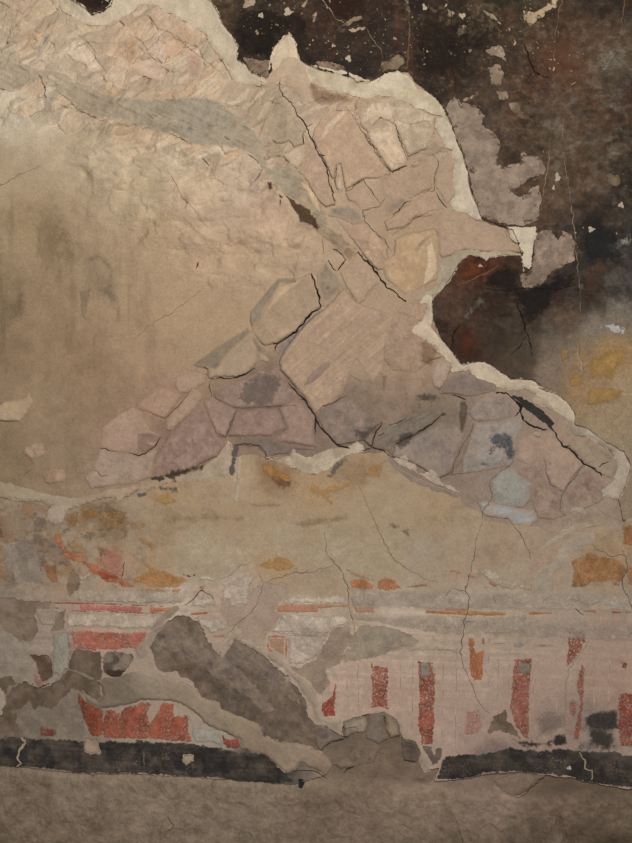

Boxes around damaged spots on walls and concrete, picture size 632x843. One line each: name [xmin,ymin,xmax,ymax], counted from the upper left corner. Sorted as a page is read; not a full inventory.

flaking render [523,0,557,26]
flaking render [485,45,524,118]
crack [279,82,447,251]
flaking render [445,92,546,226]
crack [273,273,322,349]
crack [322,237,406,302]
crack [458,120,584,372]
flaking render [520,230,577,289]
crack [288,383,444,456]
crack [496,392,607,508]
flaking render [0,649,134,733]
flaking render [150,582,418,750]